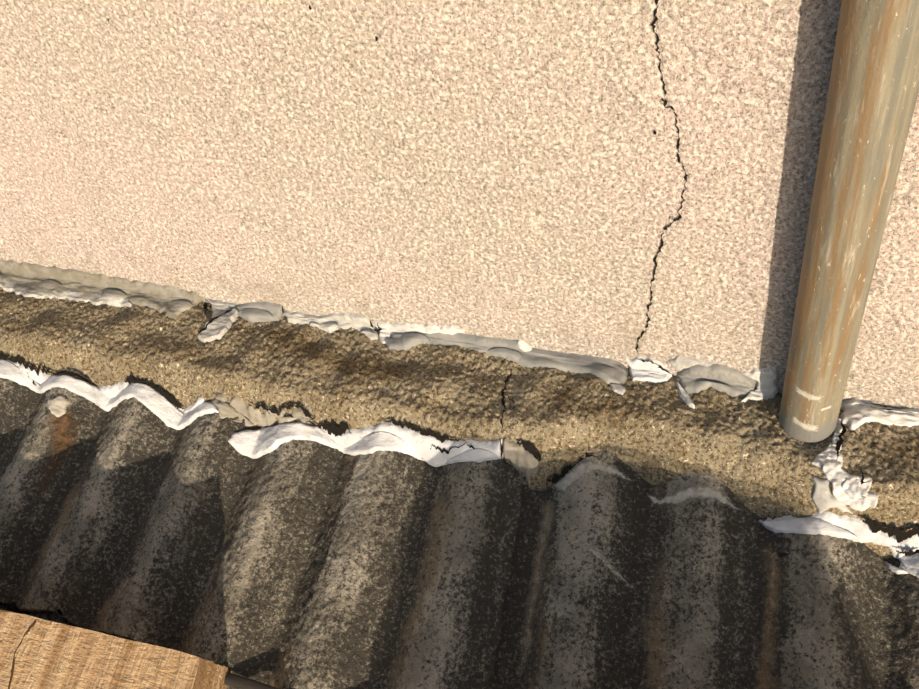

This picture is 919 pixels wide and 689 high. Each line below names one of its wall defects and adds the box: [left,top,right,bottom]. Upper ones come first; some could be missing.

crack [636,0,688,354]
crack [500,369,515,432]
corrosion [49,413,72,457]